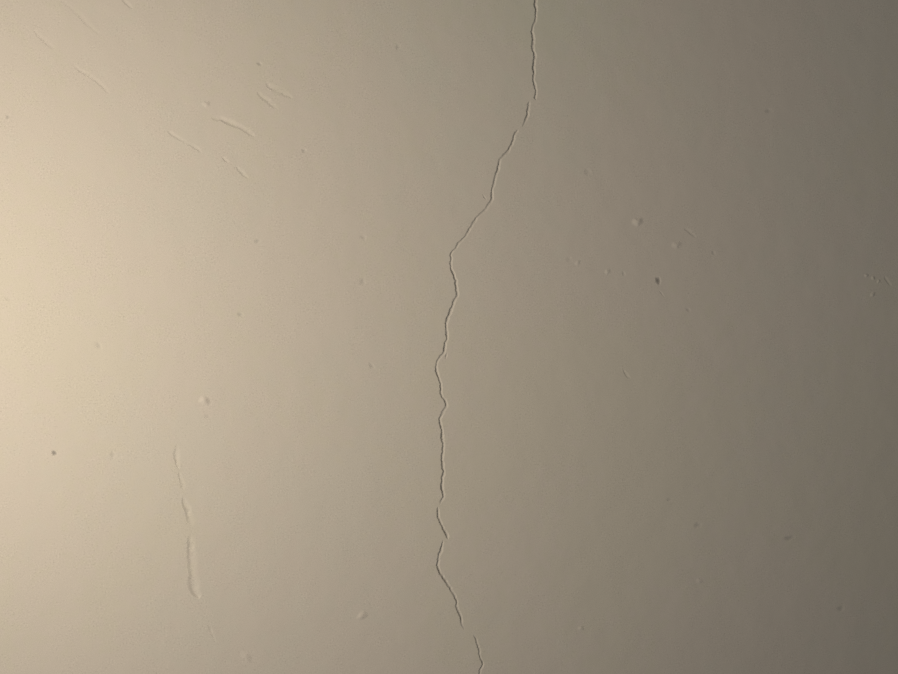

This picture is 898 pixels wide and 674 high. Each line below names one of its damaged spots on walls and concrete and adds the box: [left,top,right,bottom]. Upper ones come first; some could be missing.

crack [434,0,538,674]